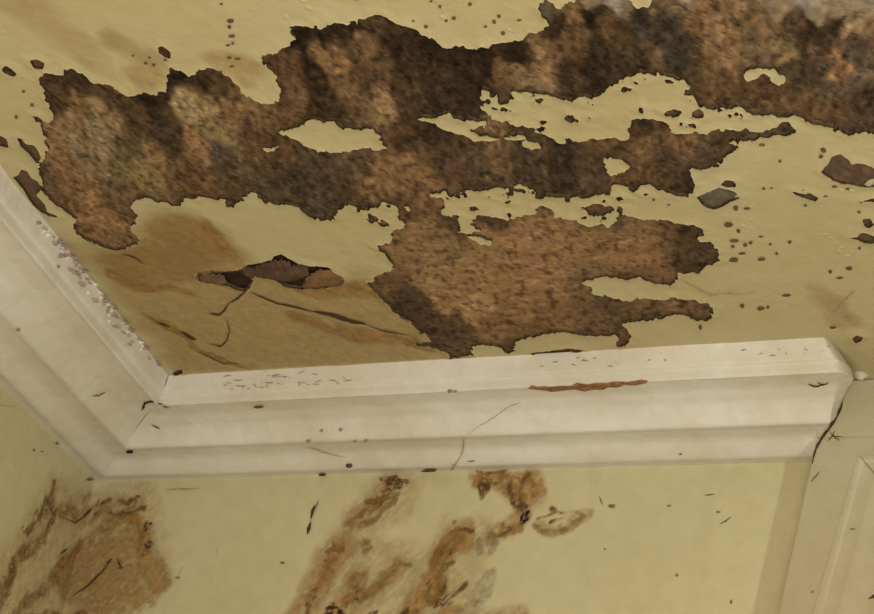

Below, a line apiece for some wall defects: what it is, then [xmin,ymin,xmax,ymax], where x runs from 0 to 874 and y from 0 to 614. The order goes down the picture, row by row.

peeling [16,0,874,367]
crack [157,286,409,390]
crack [450,401,521,472]
rust [527,380,648,392]
damp [0,480,170,614]
damp [291,475,411,614]
damp [400,470,592,614]